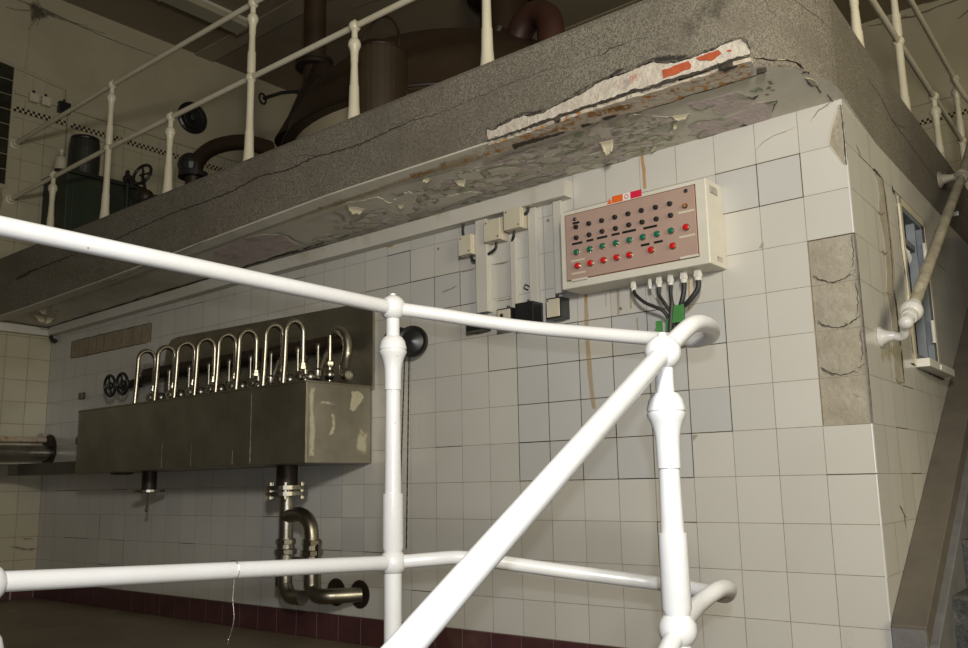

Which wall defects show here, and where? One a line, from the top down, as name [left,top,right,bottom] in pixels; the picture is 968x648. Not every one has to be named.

crack [113,66,559,240]
peeling [213,80,778,268]
corrosion [407,57,767,184]
crack [581,37,647,60]
spalling [486,36,751,141]